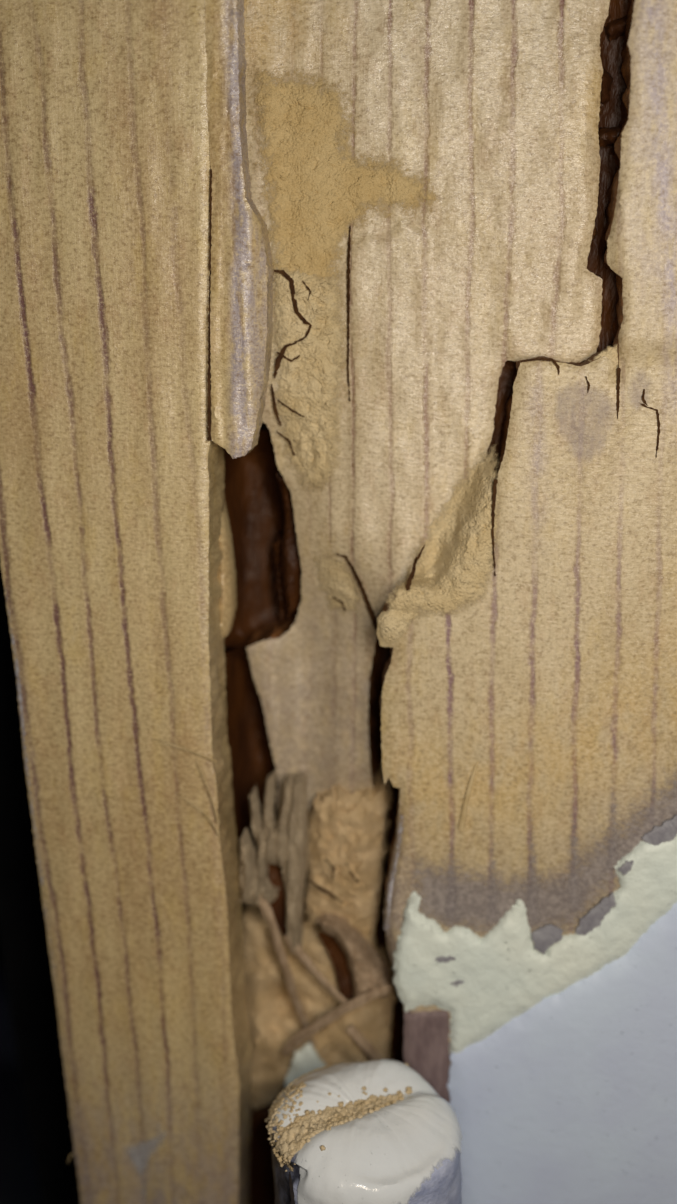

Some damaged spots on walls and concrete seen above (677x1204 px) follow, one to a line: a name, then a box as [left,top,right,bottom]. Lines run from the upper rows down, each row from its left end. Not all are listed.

crack [271,270,312,456]
crack [345,223,353,402]
crack [521,358,660,457]
crack [333,545,425,630]
crack [490,479,498,576]
peeling [393,815,677,1103]